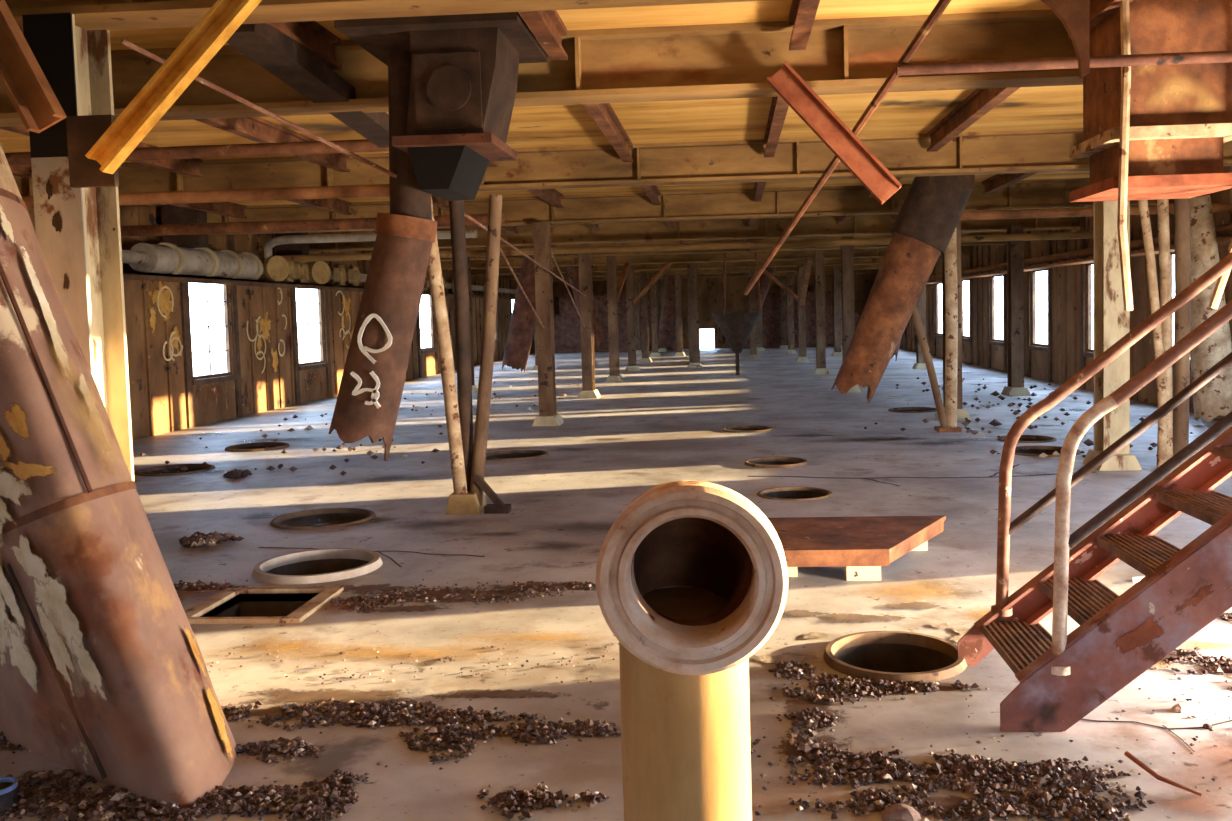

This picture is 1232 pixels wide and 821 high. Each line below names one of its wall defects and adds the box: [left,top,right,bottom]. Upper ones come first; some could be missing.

peeling [46,180,62,232]
peeling [0,205,115,455]
peeling [0,404,107,702]